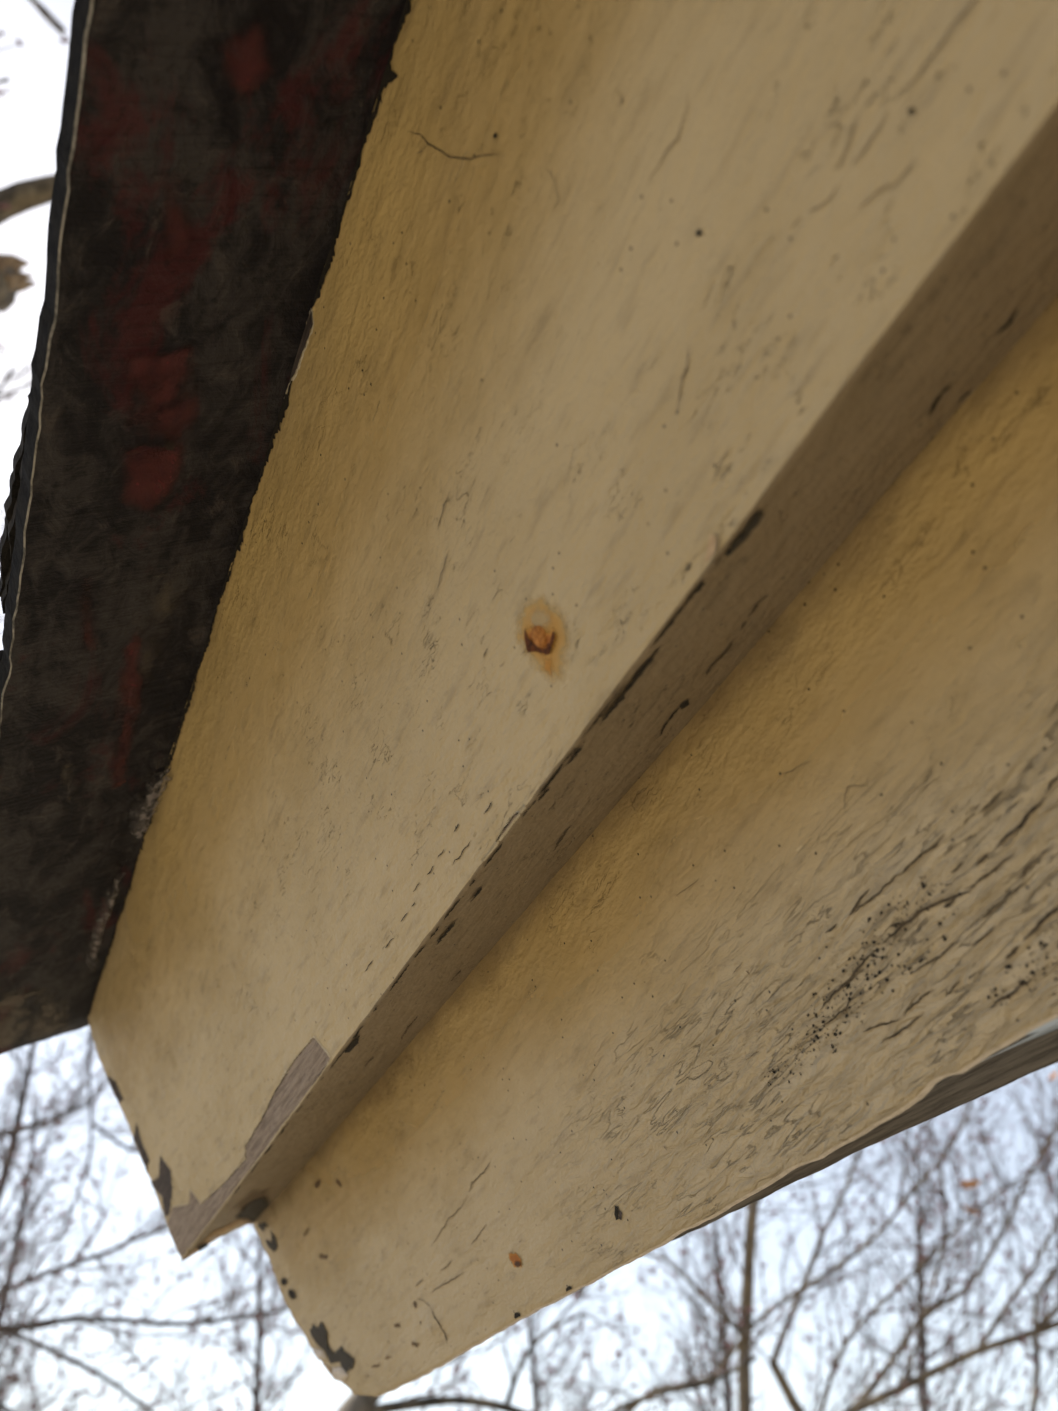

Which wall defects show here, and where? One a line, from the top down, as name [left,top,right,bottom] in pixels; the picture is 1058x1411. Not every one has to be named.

rust [517,599,566,676]
spalling [389,511,764,992]
leakage [306,295,1058,1188]
peeling [133,1007,377,1260]
spalling [309,1321,354,1382]